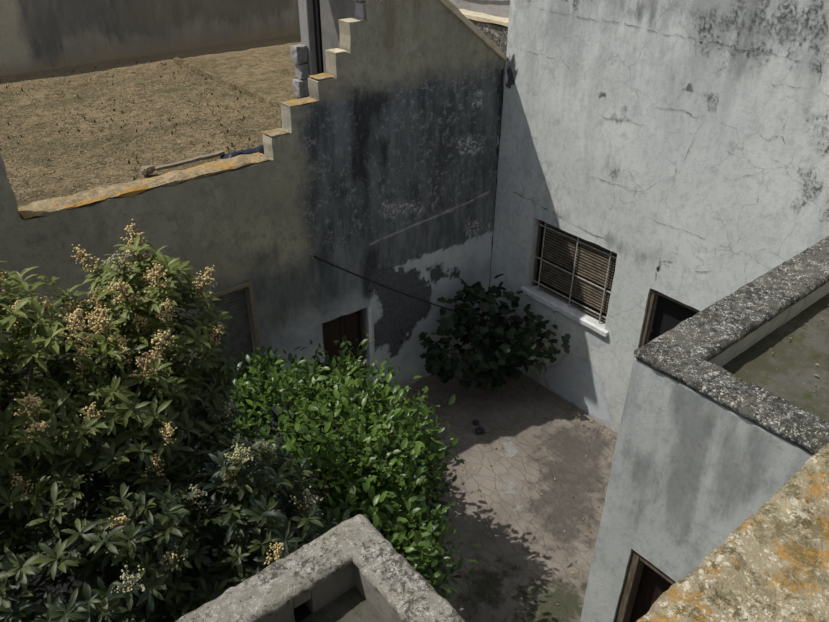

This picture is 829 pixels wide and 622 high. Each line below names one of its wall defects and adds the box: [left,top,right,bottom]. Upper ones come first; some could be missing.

damp [353,91,387,179]
peeling [367,262,460,358]